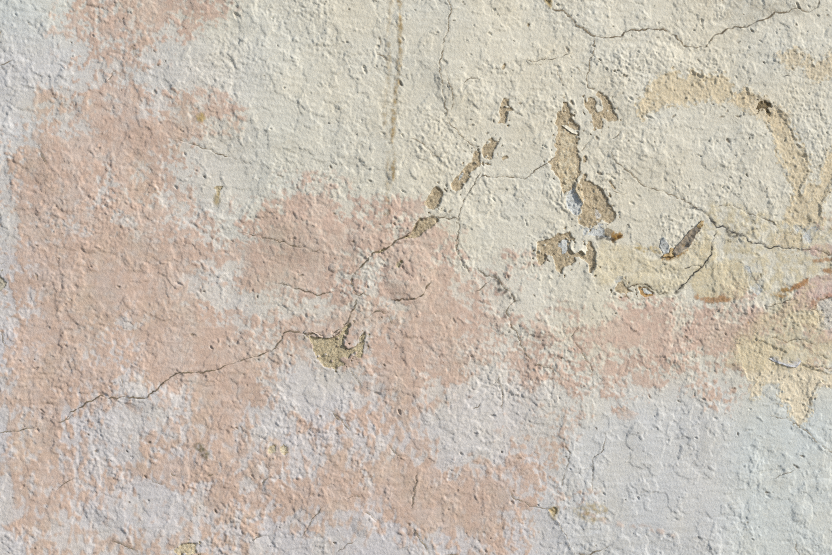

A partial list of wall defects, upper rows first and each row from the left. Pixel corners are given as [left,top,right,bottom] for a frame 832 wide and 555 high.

crack [439,0,477,149]
peeling [493,98,513,127]
crack [527,0,820,90]
crack [61,158,554,423]
peeling [405,134,509,239]
peeling [532,88,621,278]
peeling [610,275,654,298]
peeling [659,220,704,258]
crack [612,134,830,299]
flaking render [303,320,370,372]